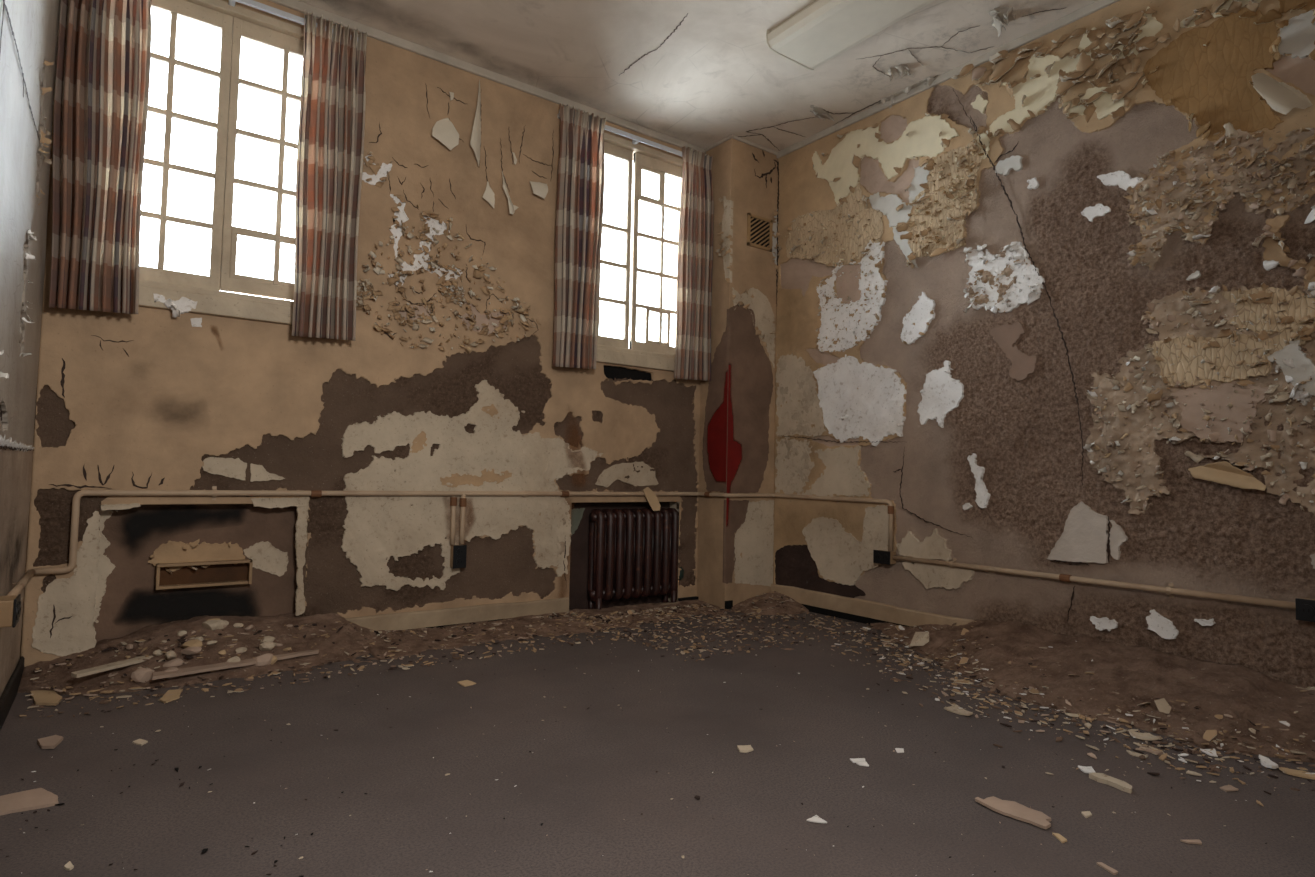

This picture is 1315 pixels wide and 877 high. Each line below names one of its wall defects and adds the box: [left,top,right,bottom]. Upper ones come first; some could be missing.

crack [0,0,39,137]
crack [621,13,688,74]
crack [738,26,1084,485]
spalling [148,0,1315,688]
crack [0,436,34,452]
peeling [32,488,141,657]